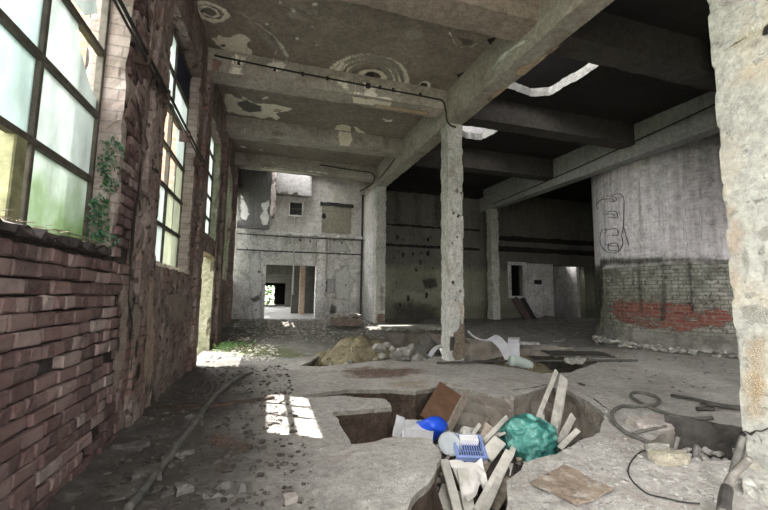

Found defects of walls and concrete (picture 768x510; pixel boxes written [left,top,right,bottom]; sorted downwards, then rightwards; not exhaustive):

peeling [197,0,231,24]
peeling [224,93,292,120]
spalling [352,92,429,122]
peeling [334,124,365,146]
peeling [240,195,249,220]
peeling [260,200,269,225]
leakage [594,254,693,326]